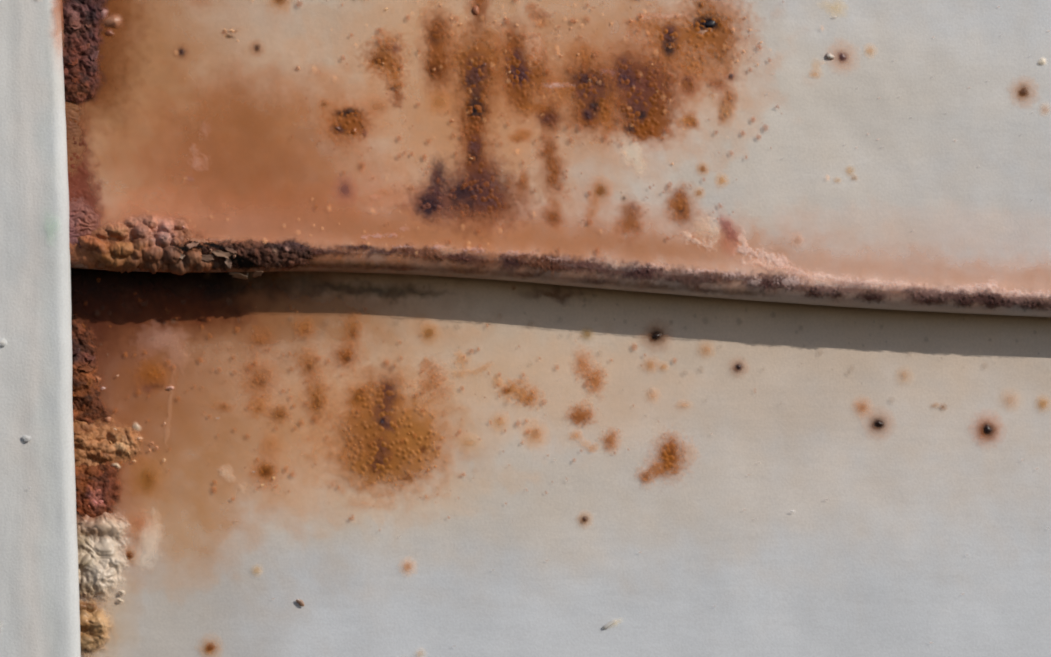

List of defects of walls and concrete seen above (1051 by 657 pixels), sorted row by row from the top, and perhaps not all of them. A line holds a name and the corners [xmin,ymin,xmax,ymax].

rust [54,0,126,252]
rust [131,0,1051,309]
rust [71,317,109,425]
rust [75,461,122,518]
rust [339,381,444,489]
rust [642,437,686,481]
rust [858,404,886,430]
rust [979,420,998,439]